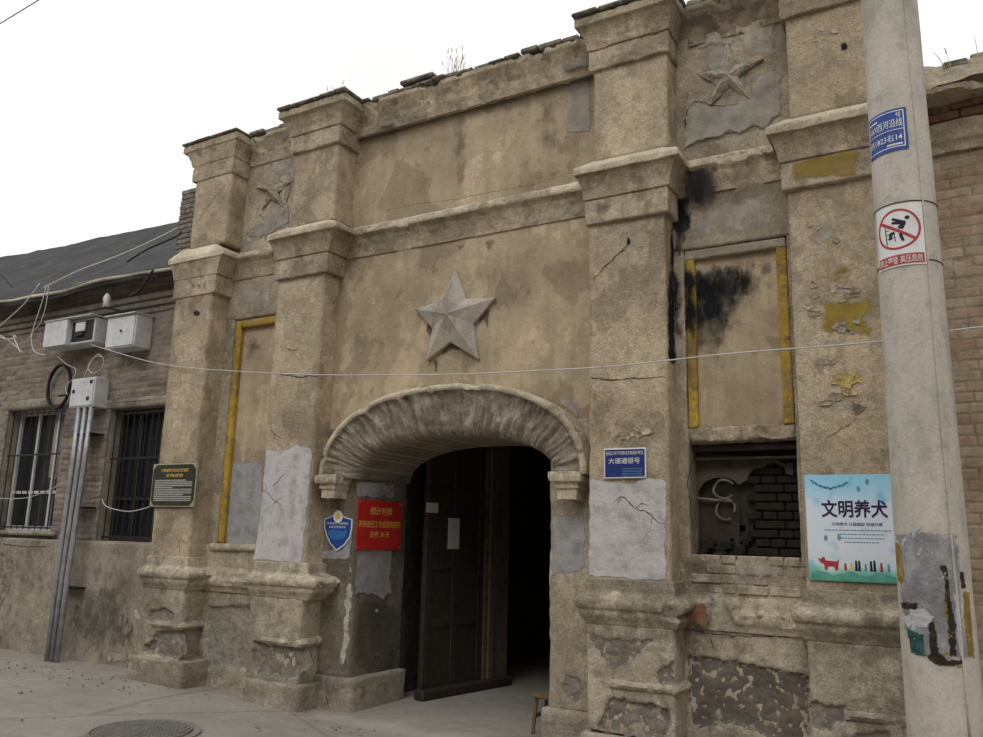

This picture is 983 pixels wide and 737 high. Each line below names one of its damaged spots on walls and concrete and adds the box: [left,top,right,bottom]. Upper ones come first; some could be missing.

crack [683,101,758,146]
leakage [673,168,715,254]
leakage [674,270,697,336]
spalling [587,631,653,669]
spalling [657,661,675,685]
spalling [598,698,671,737]
spalling [687,655,844,737]